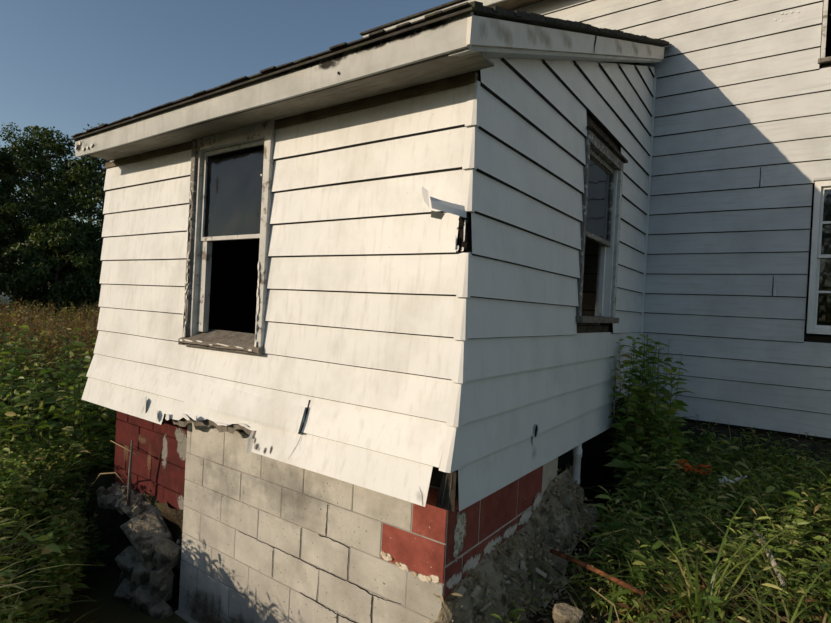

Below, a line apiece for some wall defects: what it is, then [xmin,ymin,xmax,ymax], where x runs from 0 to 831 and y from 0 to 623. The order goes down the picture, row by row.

peeling [179,252,257,351]
peeling [162,428,187,468]
spalling [381,493,543,589]